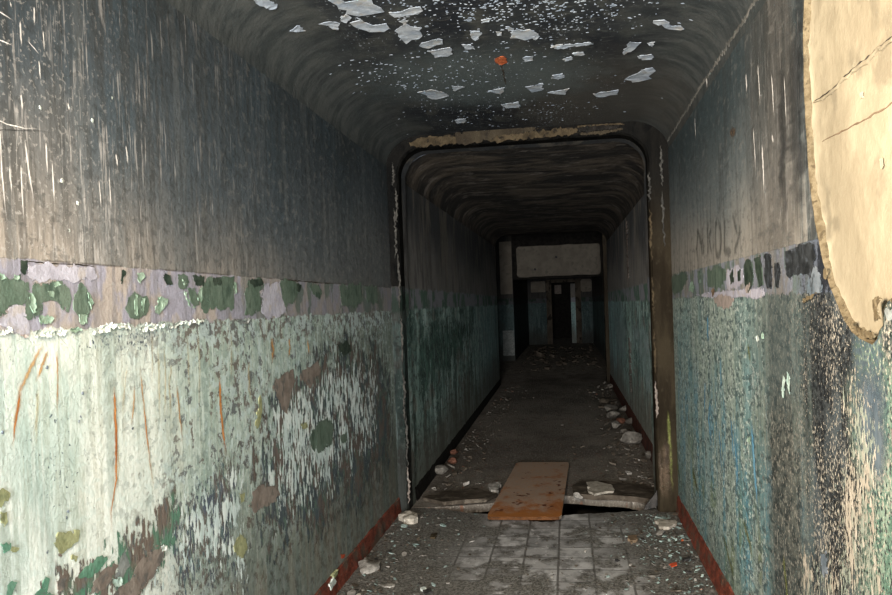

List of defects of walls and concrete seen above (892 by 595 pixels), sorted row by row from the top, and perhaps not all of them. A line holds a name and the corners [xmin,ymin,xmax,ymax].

peeling [254,0,277,10]
peeling [653,19,693,30]
flaking render [320,0,624,148]
peeling [588,42,656,109]
flaking render [672,0,892,344]
corrosion [14,351,39,436]
corrosion [132,379,151,468]
peeling [0,164,411,595]
peeling [416,309,473,407]
damp [861,381,883,475]